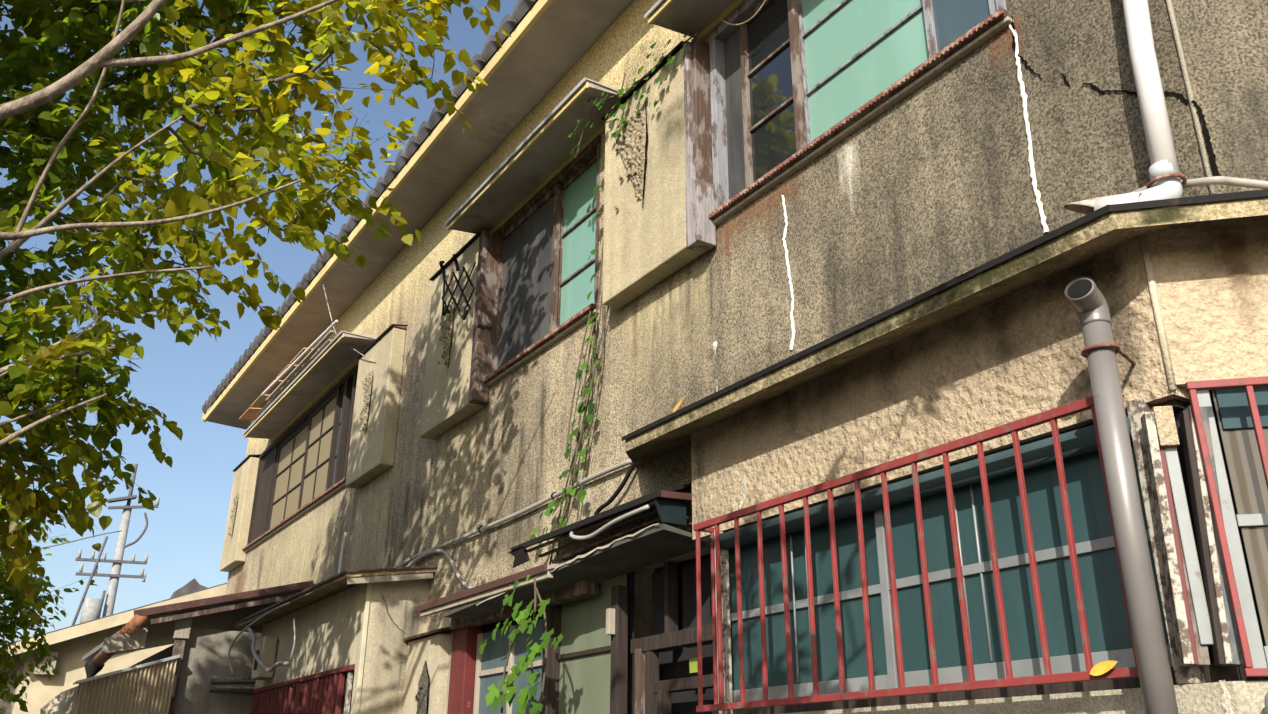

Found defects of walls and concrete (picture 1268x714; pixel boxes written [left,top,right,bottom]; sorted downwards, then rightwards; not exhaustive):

spalling [615,102,649,208]
crack [1008,16,1221,233]
damp [439,420,480,482]